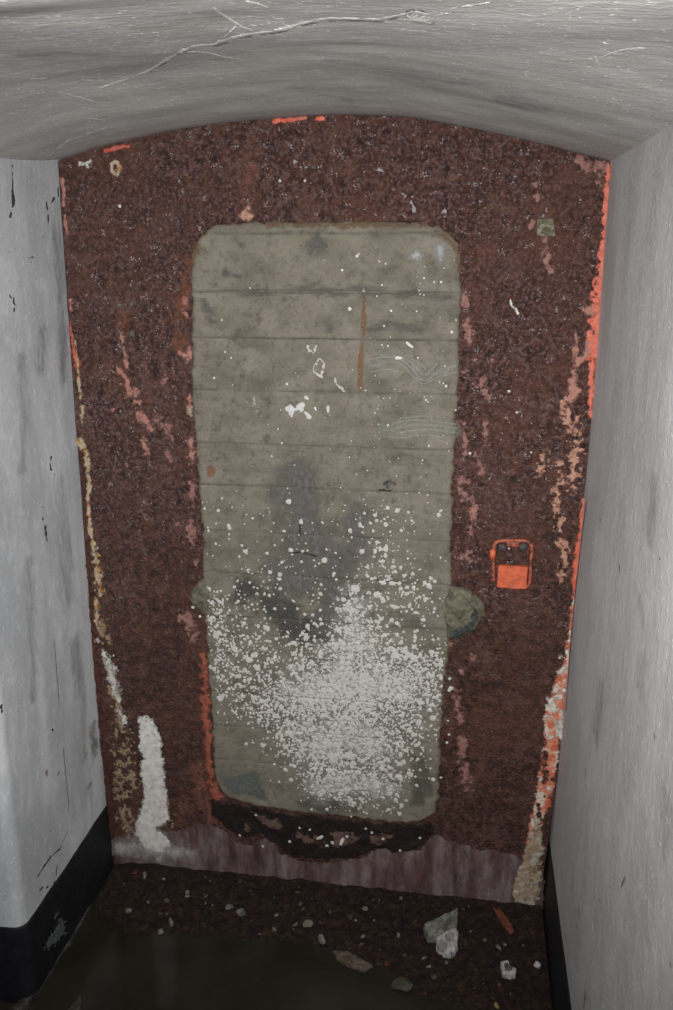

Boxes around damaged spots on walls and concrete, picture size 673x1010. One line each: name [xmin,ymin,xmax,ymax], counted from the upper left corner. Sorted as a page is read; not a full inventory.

crack [29,1,491,155]
crack [592,42,646,70]
rust [358,297,366,392]
rust [78,447,118,855]
damp [76,437,193,862]
damp [191,453,478,822]
peeling [104,155,611,908]
rust [565,505,586,710]
rust [536,750,555,838]